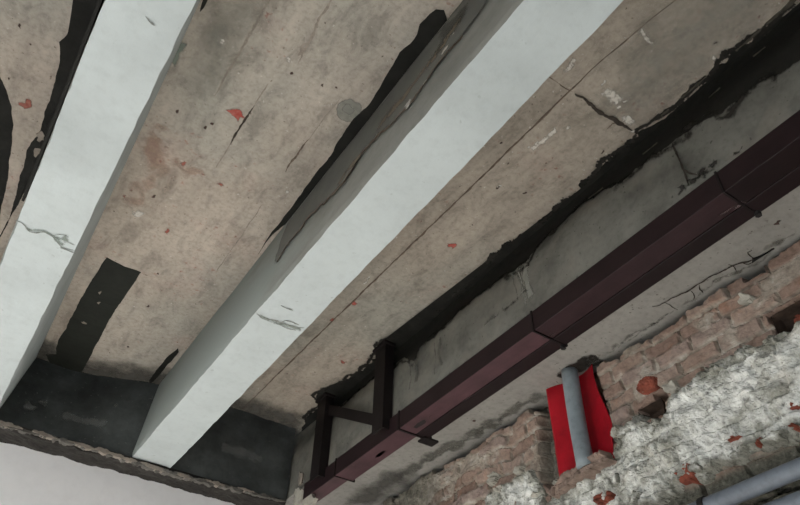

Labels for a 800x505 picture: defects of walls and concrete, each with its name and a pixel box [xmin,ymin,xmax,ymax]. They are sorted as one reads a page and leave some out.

crack [216,84,268,167]
leakage [337,99,361,122]
peeling [275,0,486,262]
crack [16,220,76,254]
crack [243,0,675,409]
crack [653,248,774,310]
peeling [484,300,800,505]